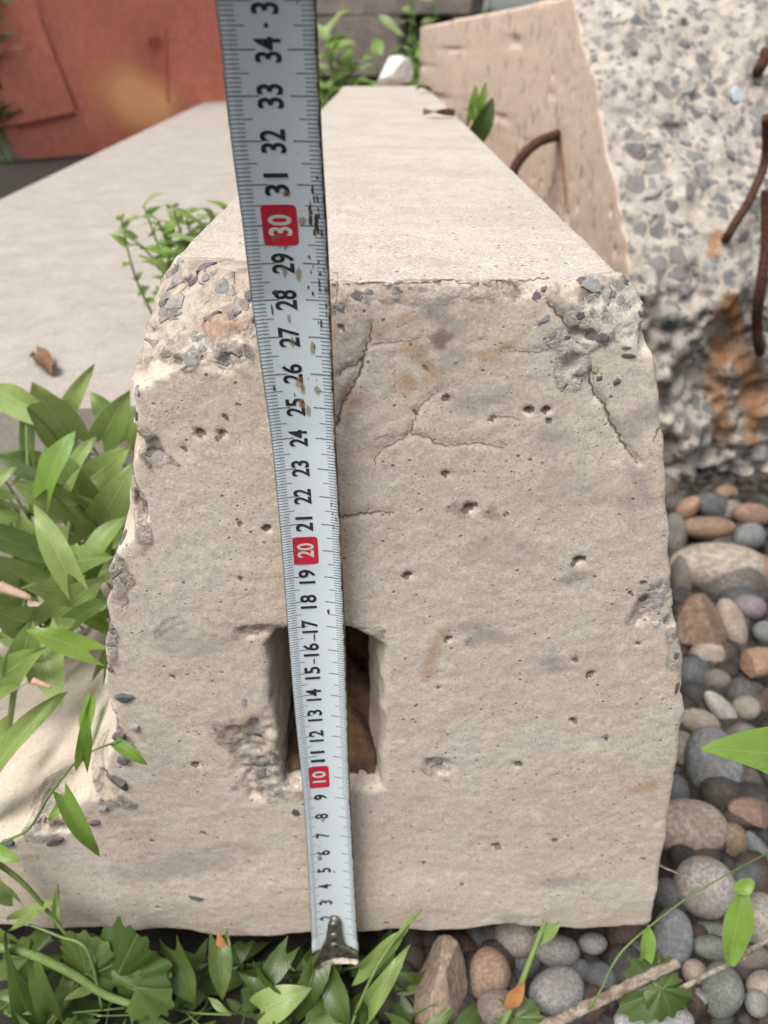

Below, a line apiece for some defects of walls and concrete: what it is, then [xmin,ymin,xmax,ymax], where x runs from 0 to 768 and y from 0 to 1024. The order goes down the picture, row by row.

spalling [135,257,256,377]
crack [335,324,420,425]
crack [374,390,504,464]
spalling [537,271,646,391]
crack [588,370,661,463]
corrosion [708,296,766,444]
spalling [212,717,303,816]